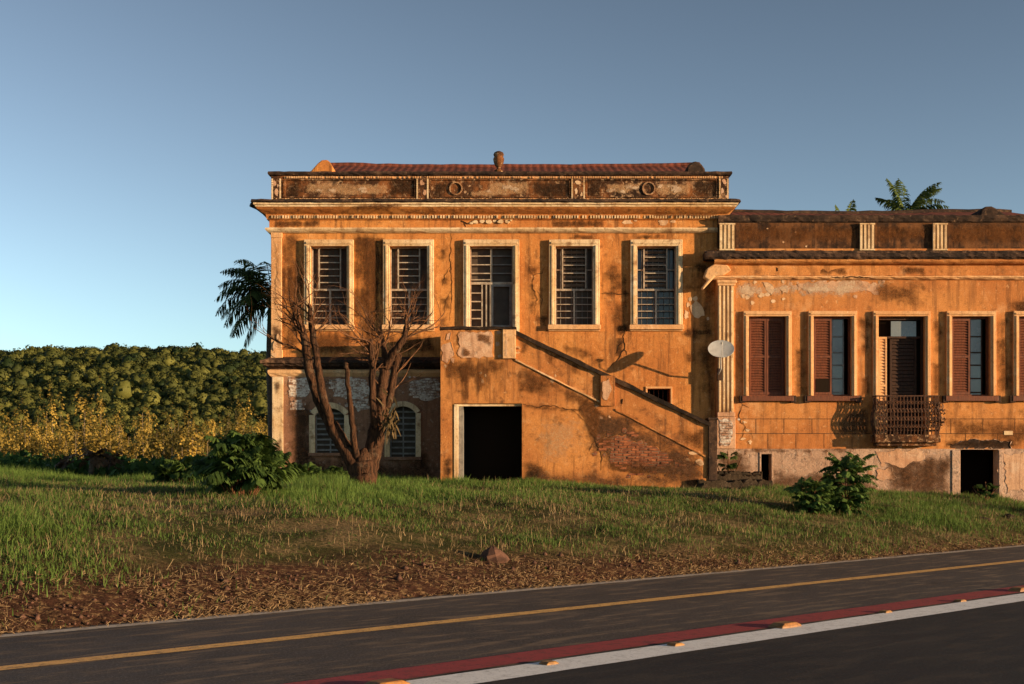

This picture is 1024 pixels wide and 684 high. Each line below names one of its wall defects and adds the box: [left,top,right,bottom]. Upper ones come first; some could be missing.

water stain [534,182,567,197]
crack [442,221,467,316]
peeling [684,296,709,320]
peeling [736,280,885,305]
peeling [441,331,502,368]
flaking render [287,376,312,414]
flaking render [329,377,370,412]
flaking render [401,376,441,402]
flaking render [592,378,704,478]
water stain [889,459,951,493]